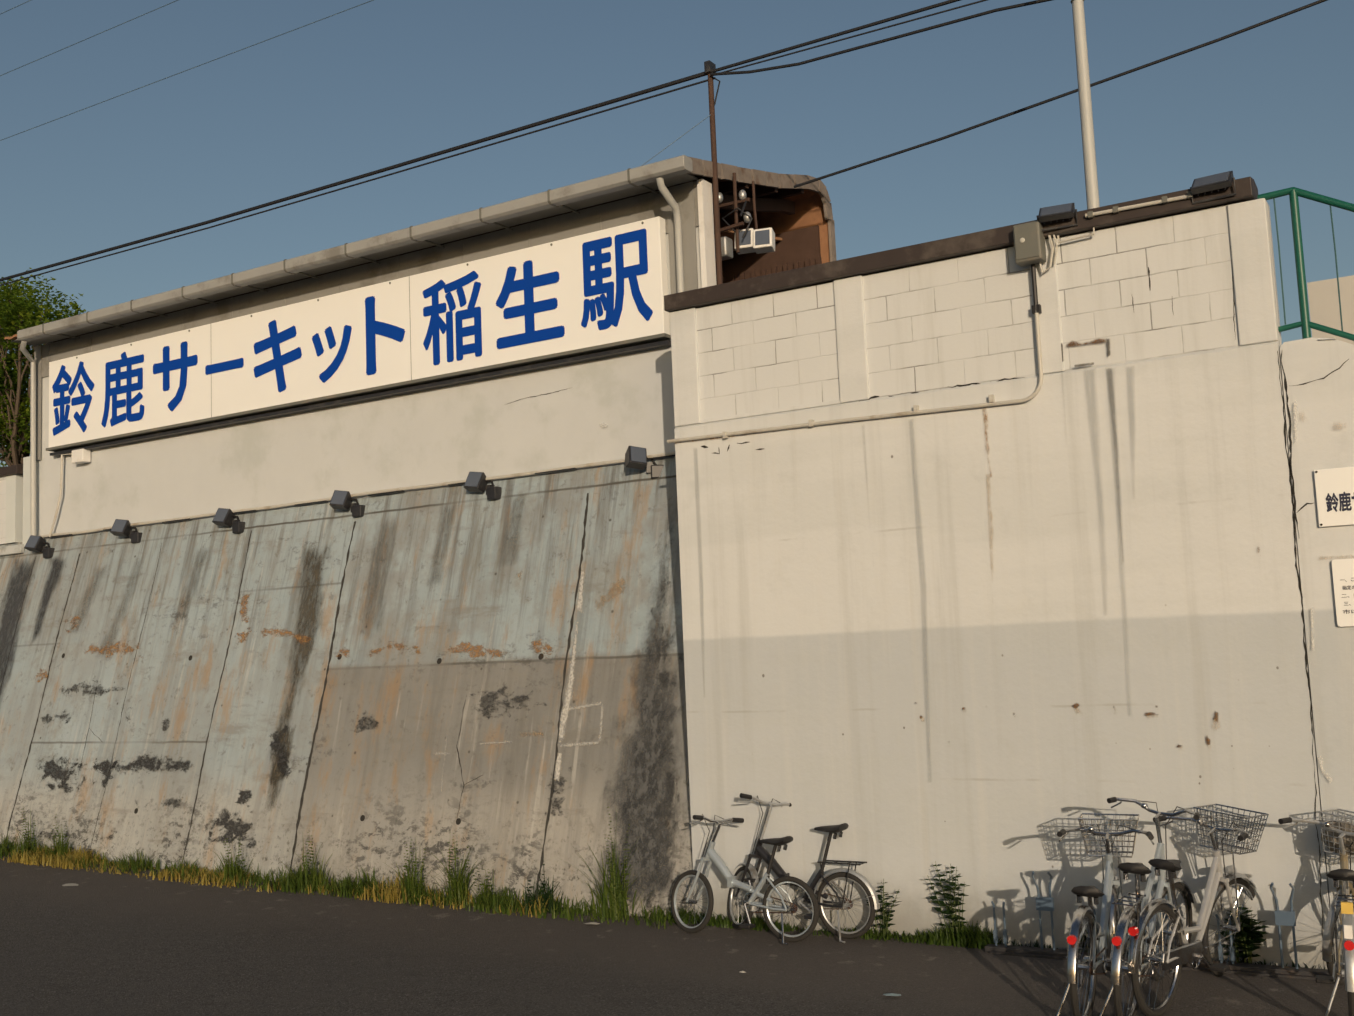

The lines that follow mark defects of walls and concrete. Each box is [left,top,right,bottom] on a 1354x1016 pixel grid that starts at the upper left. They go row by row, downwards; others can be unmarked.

water stain [0,559,62,694]
corrosion [86,642,139,657]
water stain [206,791,256,848]
water stain [270,550,326,805]
water stain [604,615,679,908]
crack [1277,351,1349,938]